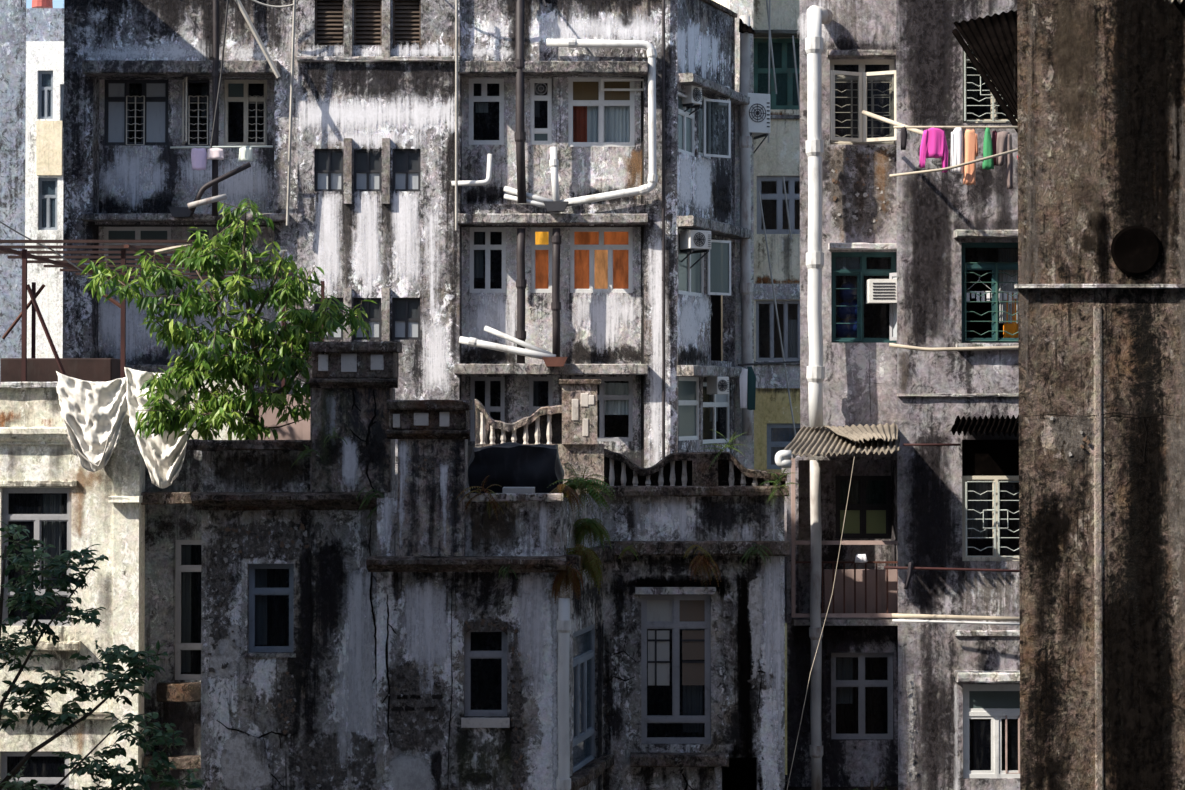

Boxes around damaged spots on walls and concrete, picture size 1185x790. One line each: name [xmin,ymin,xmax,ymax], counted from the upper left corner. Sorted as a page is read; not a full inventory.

leakage [296,0,731,390]
leakage [1081,226,1109,284]
leakage [1114,0,1143,228]
leakage [1158,0,1183,187]
crack [350,390,379,492]
crack [368,521,397,750]
leakage [300,513,559,790]
leakage [909,434,960,790]
leakage [1102,599,1170,790]